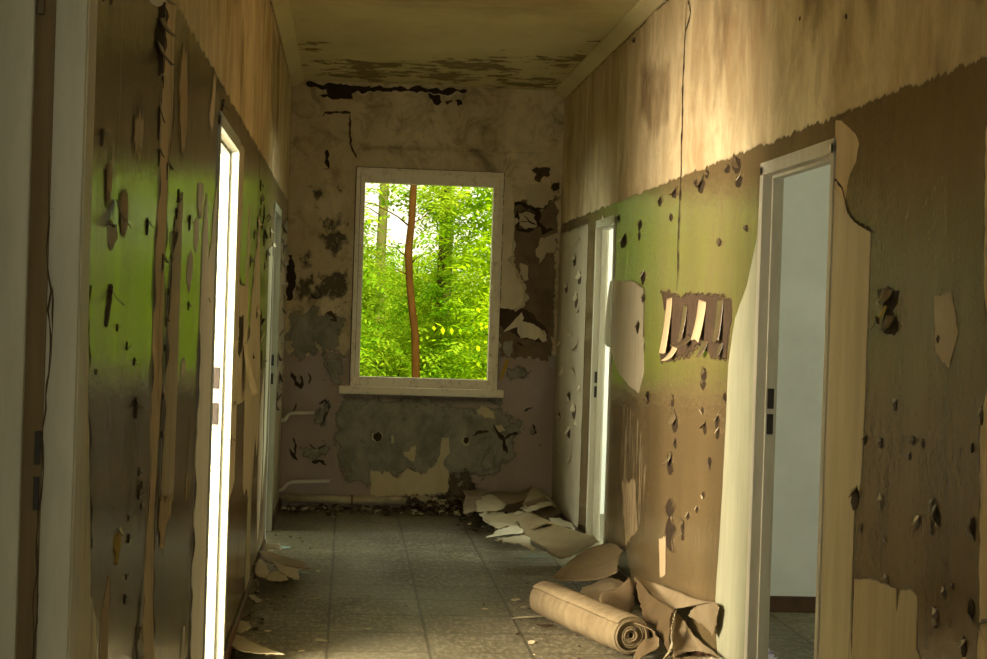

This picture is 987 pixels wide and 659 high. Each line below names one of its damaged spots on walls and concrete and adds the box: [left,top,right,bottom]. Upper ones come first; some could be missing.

flaking render [298,42,586,106]
peeling [835,120,859,206]
peeling [600,215,642,248]
peeling [105,284,125,331]
peeling [133,0,204,659]
flaking render [229,145,347,516]
flaking render [499,165,588,528]
peeling [869,286,899,335]
flaking render [314,395,522,509]
peeling [659,212,759,659]
peeling [849,485,860,510]
peeling [959,390,987,659]